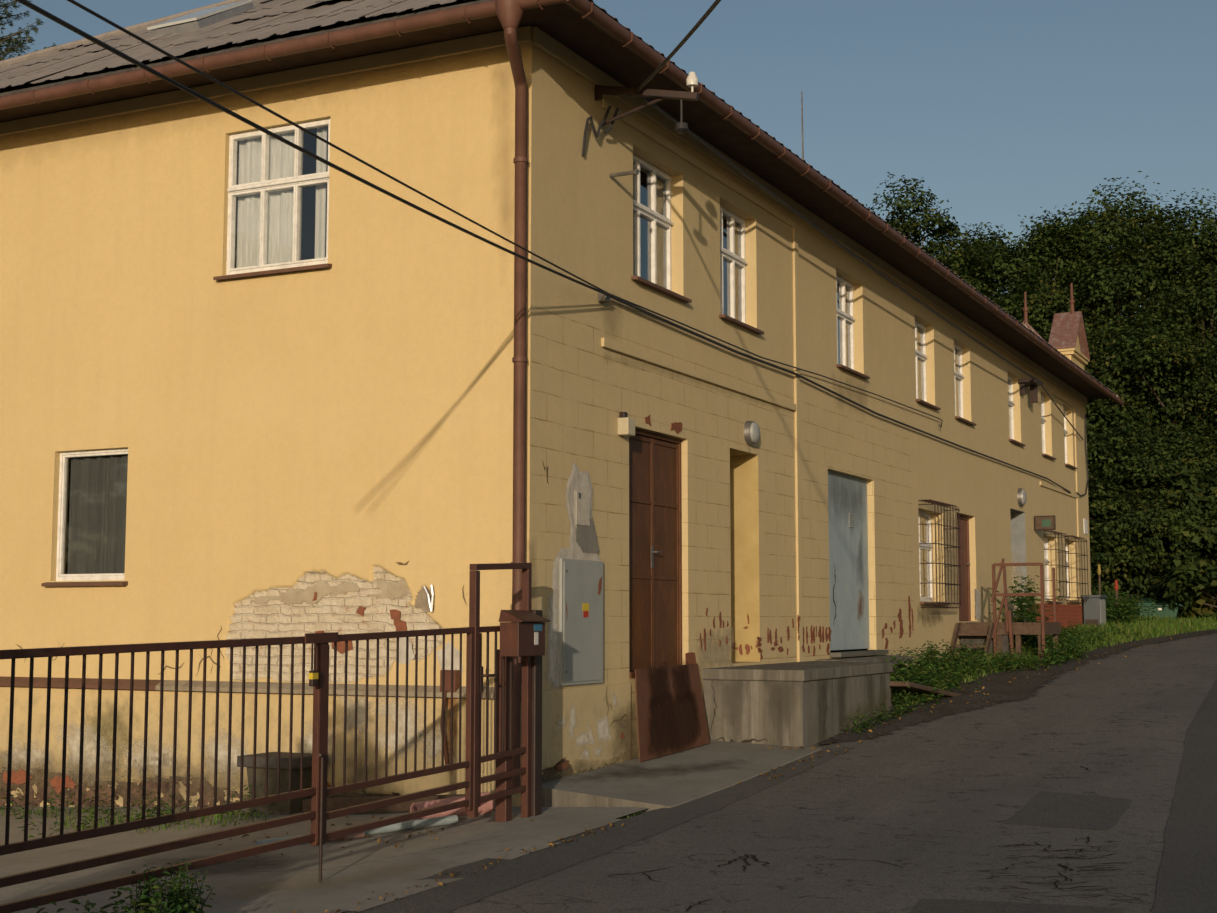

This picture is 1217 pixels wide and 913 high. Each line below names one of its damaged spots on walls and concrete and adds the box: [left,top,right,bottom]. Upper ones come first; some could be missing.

spalling [225,560,463,683]
peeling [685,608,831,664]
peeling [882,596,914,649]